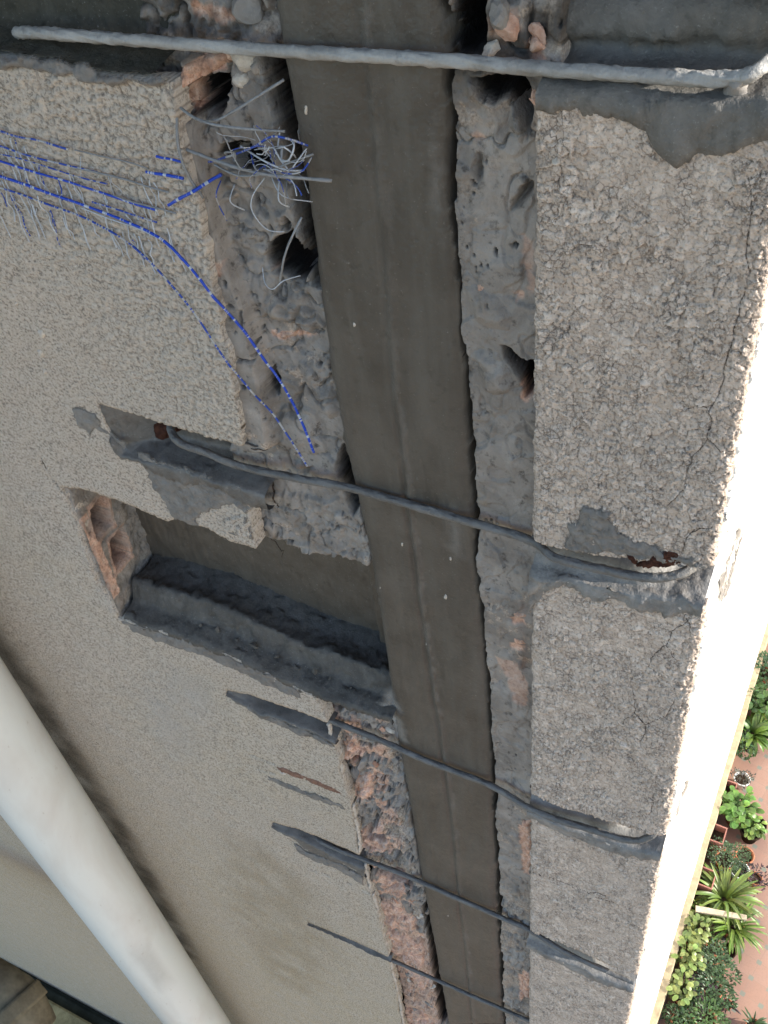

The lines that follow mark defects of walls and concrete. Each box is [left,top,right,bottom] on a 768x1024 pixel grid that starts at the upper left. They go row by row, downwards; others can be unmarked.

spalling [181,53,233,106]
spalling [154,423,181,440]
spalling [626,551,681,569]
spalling [342,740,376,800]
spalling [361,822,394,854]
spalling [381,866,430,990]